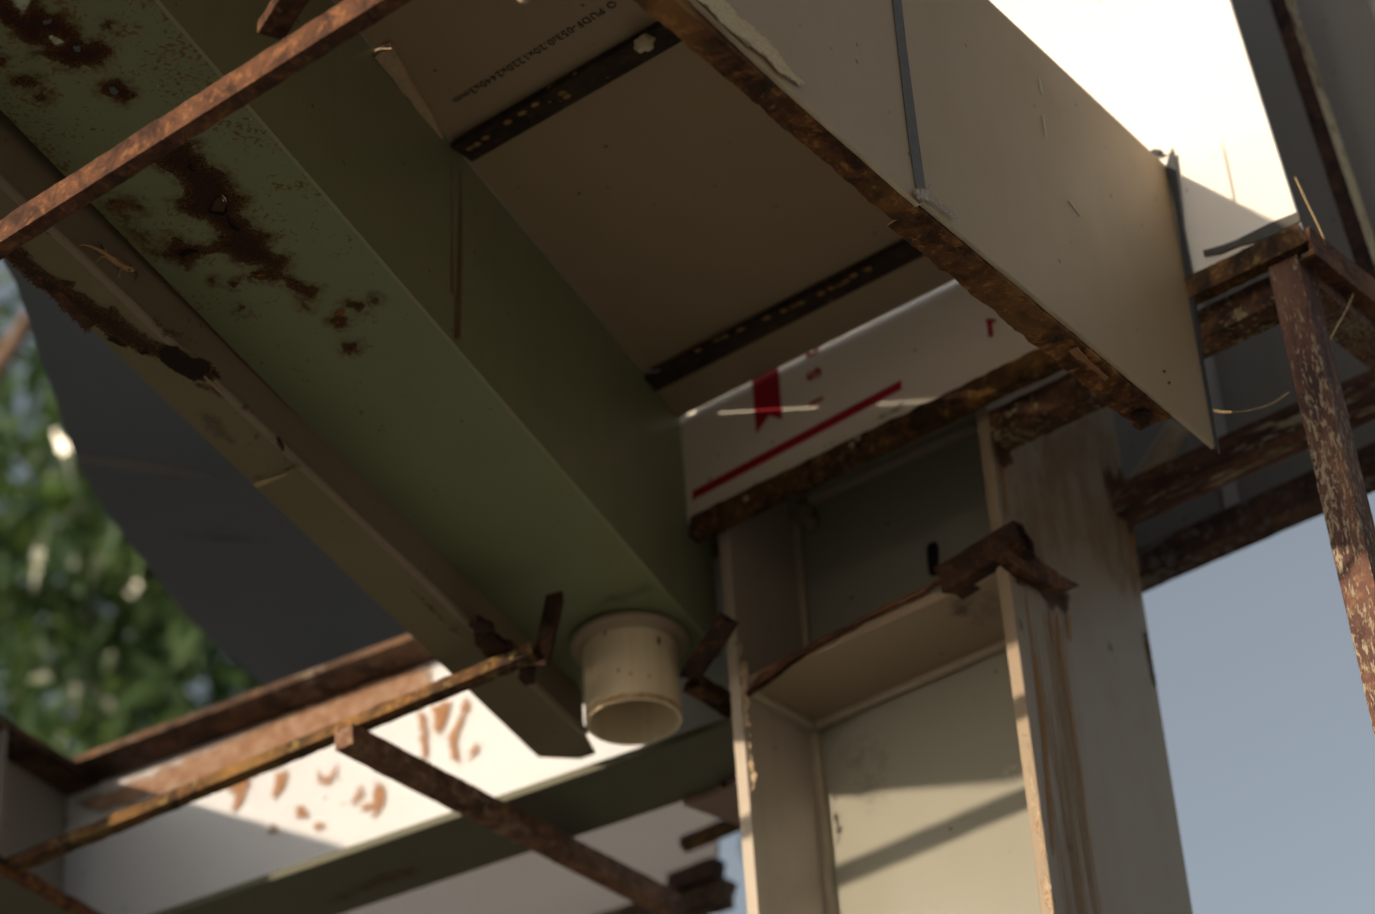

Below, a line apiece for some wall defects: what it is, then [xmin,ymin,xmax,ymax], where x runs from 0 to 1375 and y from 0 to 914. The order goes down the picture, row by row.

peeling [699,0,805,85]
rust [0,0,411,397]
rust [81,668,681,914]
rust [1015,576,1071,854]